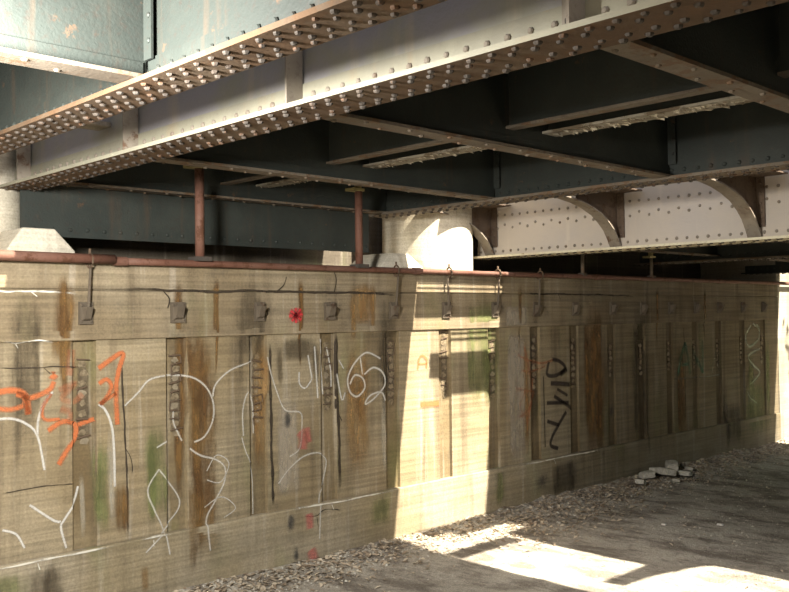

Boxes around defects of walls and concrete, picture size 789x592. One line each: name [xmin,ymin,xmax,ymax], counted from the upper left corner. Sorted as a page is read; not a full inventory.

rust [53,283,74,390]
spalling [76,359,91,444]
spalling [168,354,183,436]
rust [175,285,219,553]
spalling [251,352,264,425]